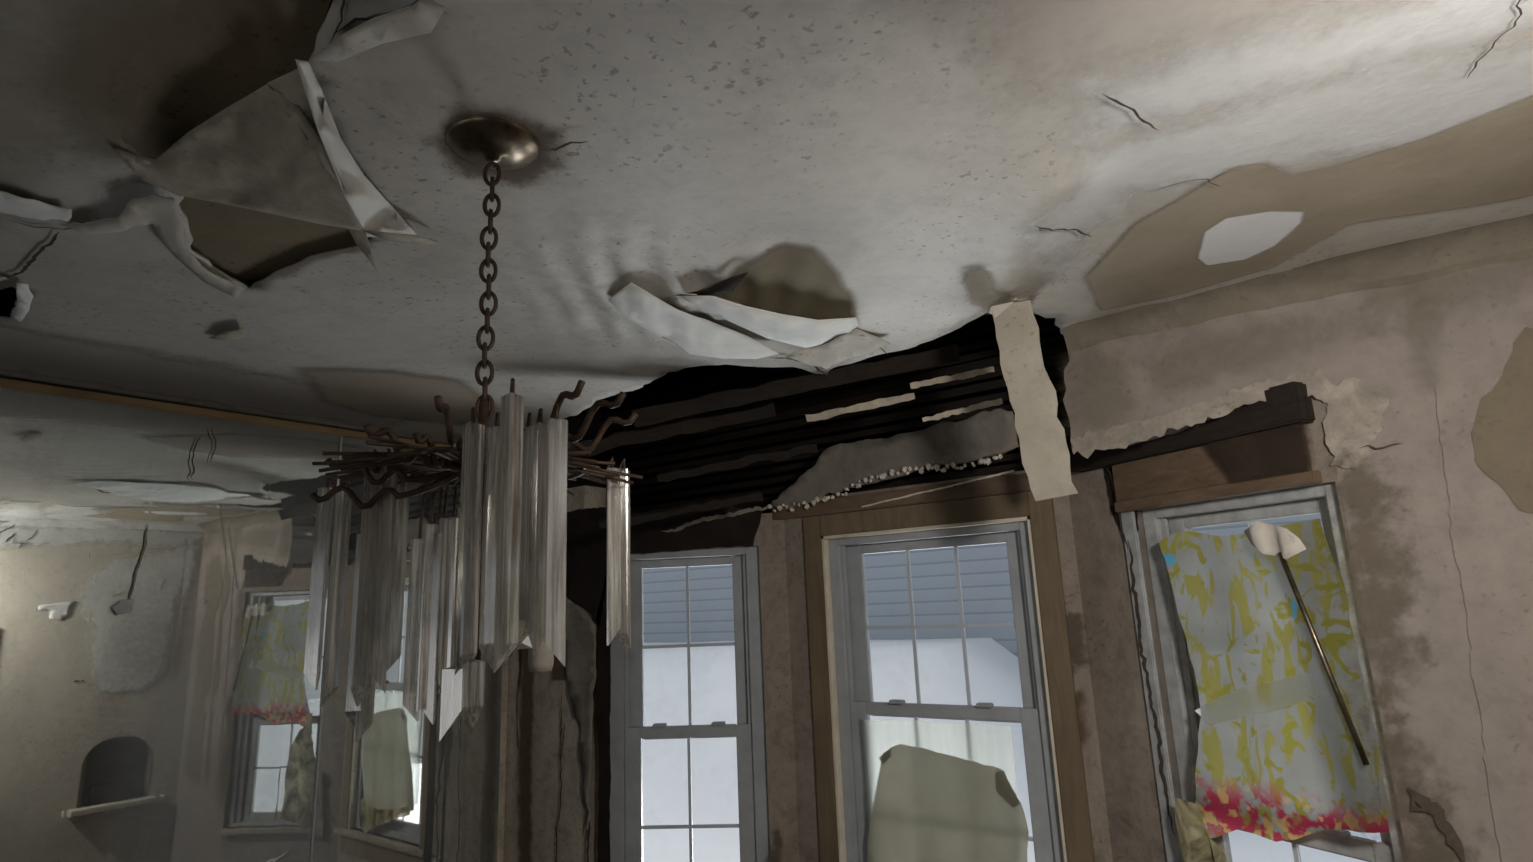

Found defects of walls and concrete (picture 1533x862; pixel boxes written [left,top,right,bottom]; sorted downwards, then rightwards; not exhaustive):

peeling [124,0,445,159]
spalling [0,276,33,323]
peeling [179,197,372,286]
peeling [1471,327,1533,513]
spalling [518,320,1022,862]